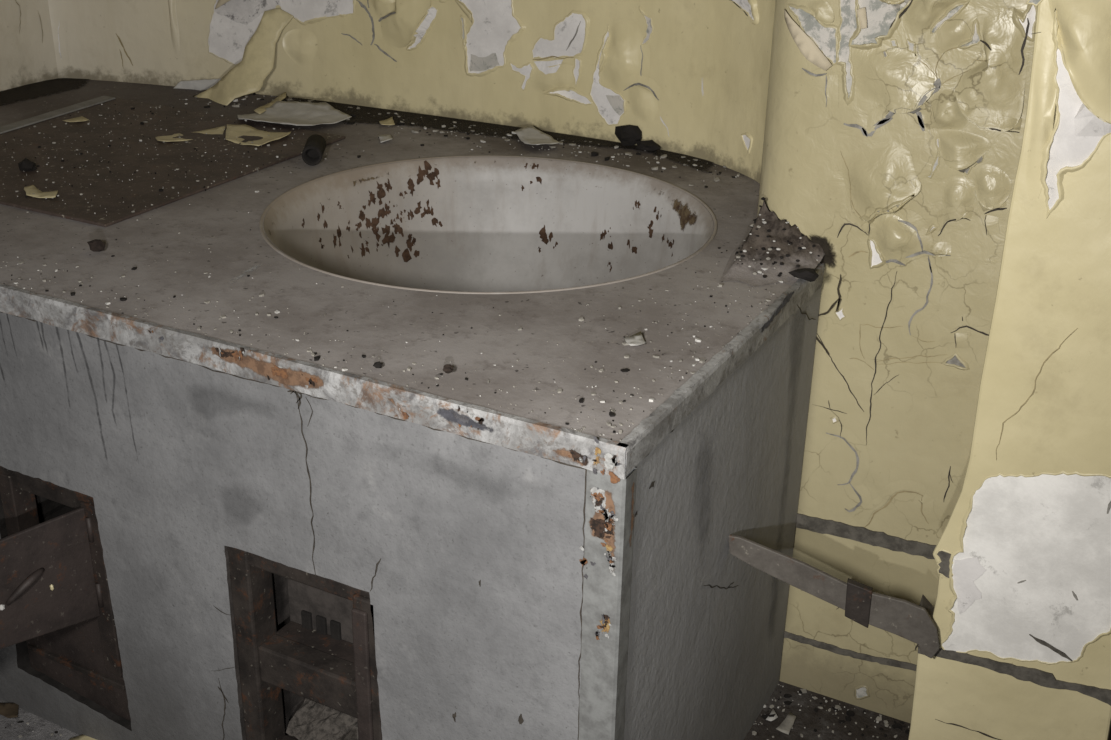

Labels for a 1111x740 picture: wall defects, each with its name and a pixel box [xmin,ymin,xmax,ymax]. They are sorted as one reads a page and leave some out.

peeling [155,92,352,146]
peeling [174,0,356,105]
peeling [406,0,627,126]
peeling [784,0,917,106]
crack [964,104,1022,133]
peeling [1040,9,1111,219]
crack [797,45,1007,527]
leakage [37,322,127,440]
rust [211,347,323,389]
crack [287,390,316,576]
rust [553,436,634,579]
peeling [936,470,1111,665]